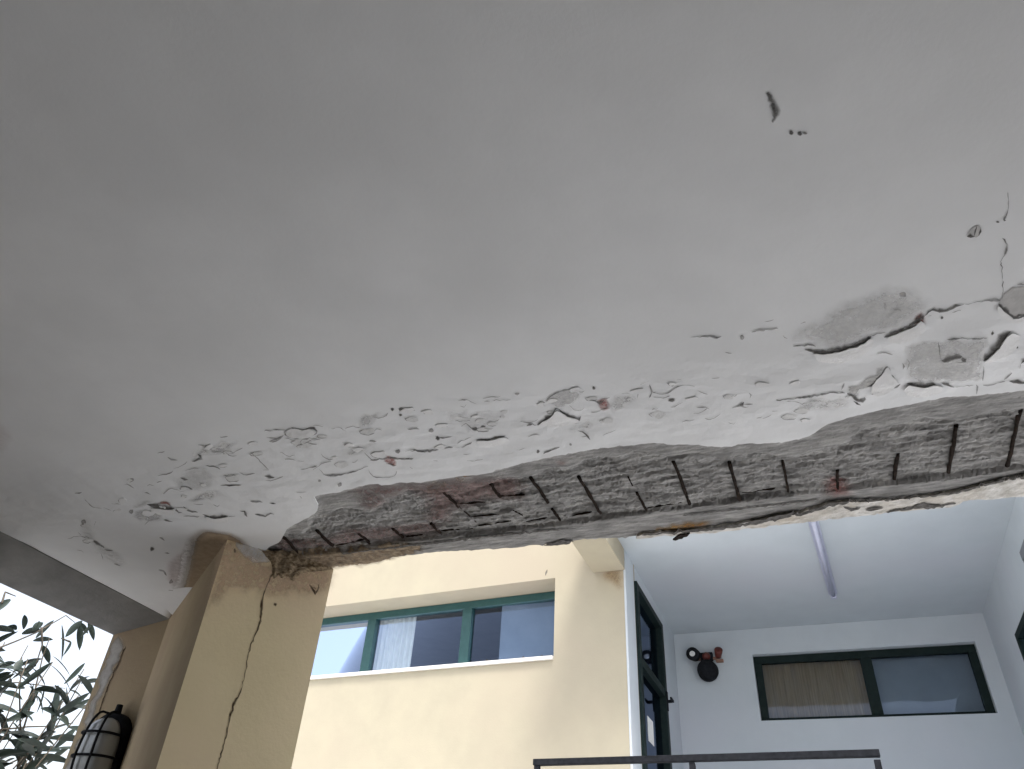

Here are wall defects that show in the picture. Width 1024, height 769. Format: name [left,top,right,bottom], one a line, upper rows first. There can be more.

hole [766,92,779,122]
peeling [967,226,981,238]
peeling [108,396,508,522]
spalling [262,284,1024,581]
leakage [183,531,328,592]
rust [278,476,519,549]
rust [663,523,704,531]
crack [217,574,278,769]